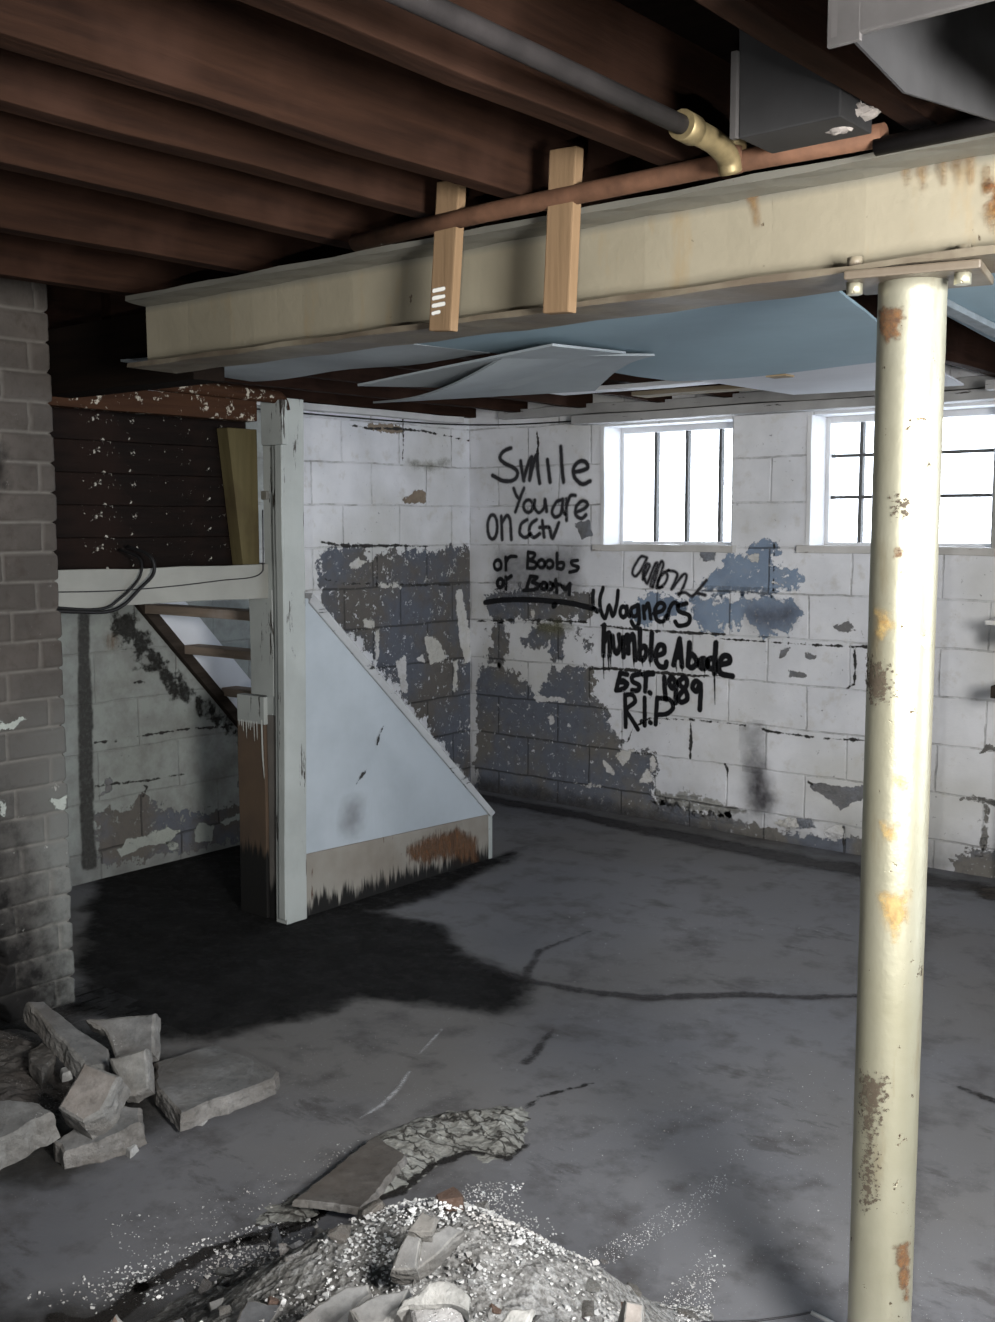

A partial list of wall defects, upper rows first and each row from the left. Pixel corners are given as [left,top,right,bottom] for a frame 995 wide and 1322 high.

corrosion [940,162,995,221]
peeling [0,716,26,730]
peeling [315,538,863,856]
peeling [49,795,67,810]
peeling [93,778,240,869]
corrosion [407,827,478,867]
crack [478,940,857,1000]
crack [958,1086,995,1102]
corrosion [858,1066,894,1215]
crack [379,1144,528,1200]
crack [46,1209,330,1322]
corrosion [896,1242,911,1301]